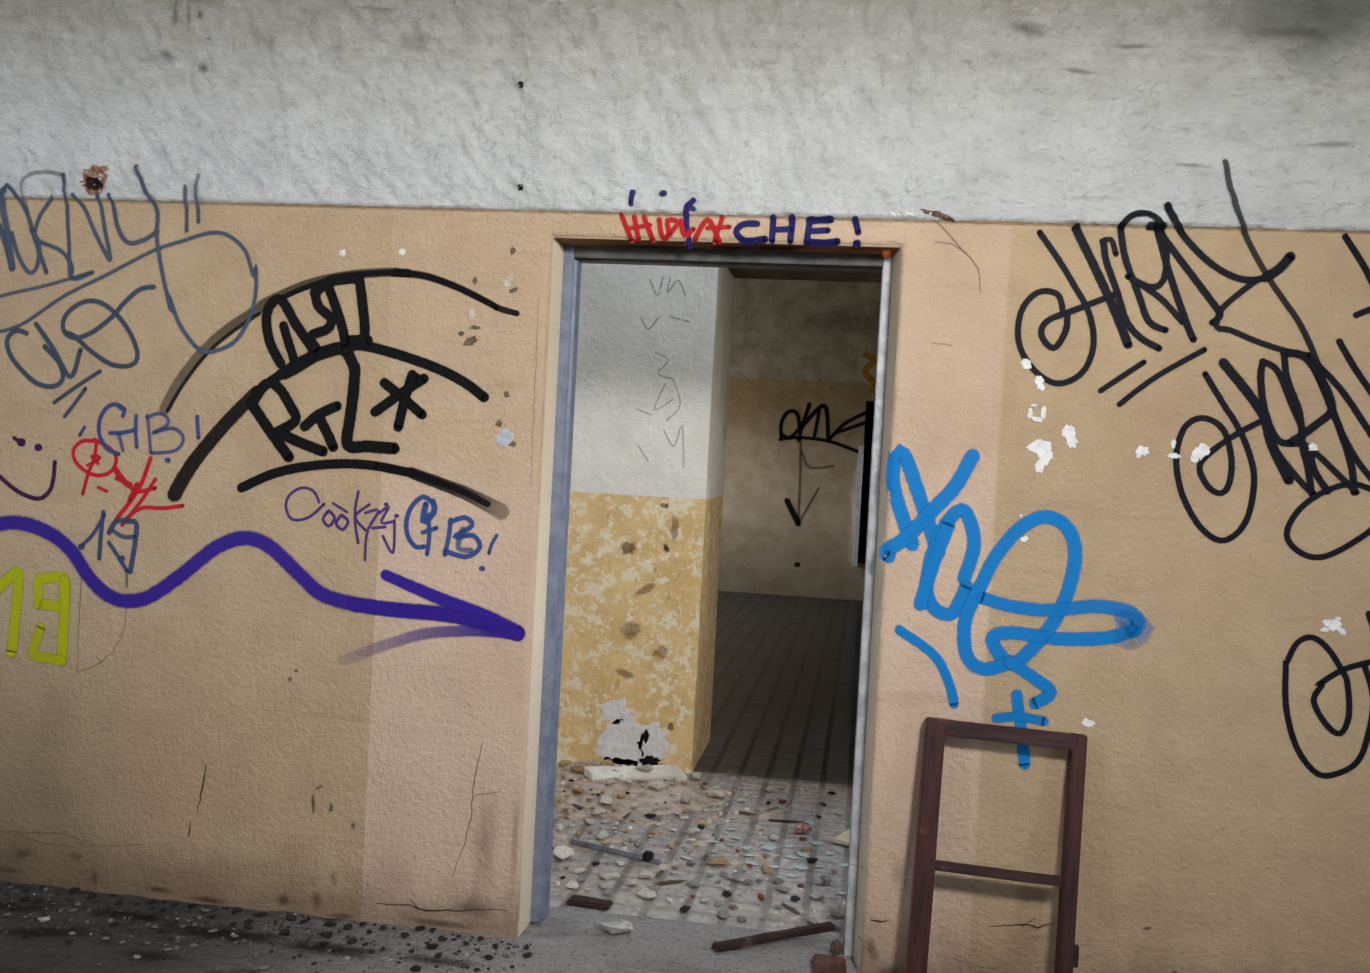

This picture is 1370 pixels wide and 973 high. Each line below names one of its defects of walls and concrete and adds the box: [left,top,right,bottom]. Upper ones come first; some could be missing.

peeling [596,698,673,766]
crack [377,742,507,912]